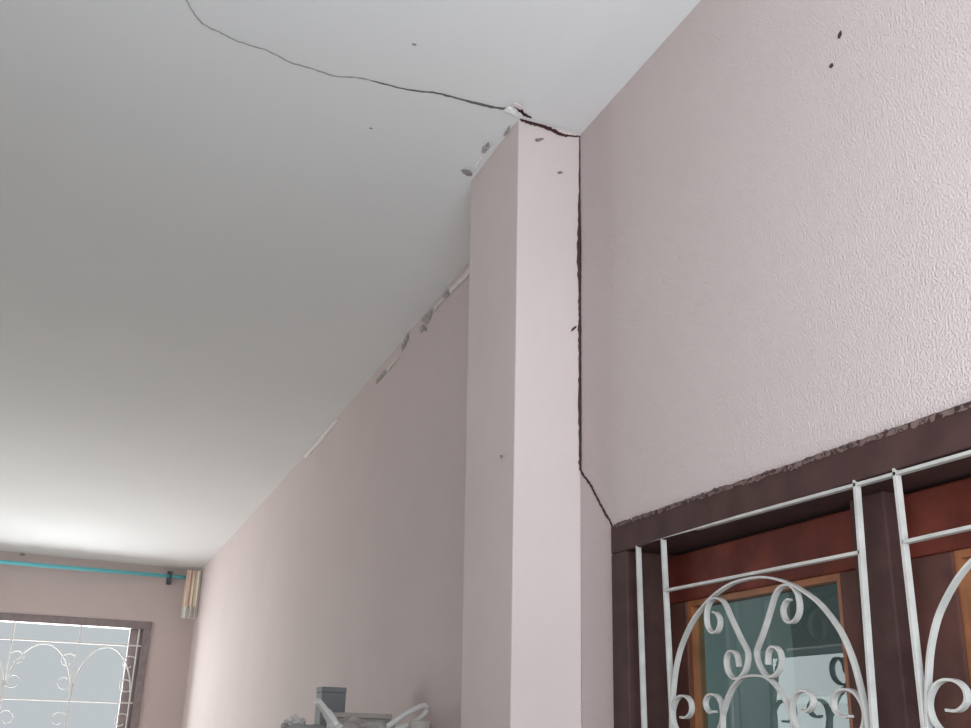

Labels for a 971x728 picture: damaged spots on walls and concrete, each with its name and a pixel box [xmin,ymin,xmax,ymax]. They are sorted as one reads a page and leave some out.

crack [186,0,613,527]
peeling [356,267,470,403]